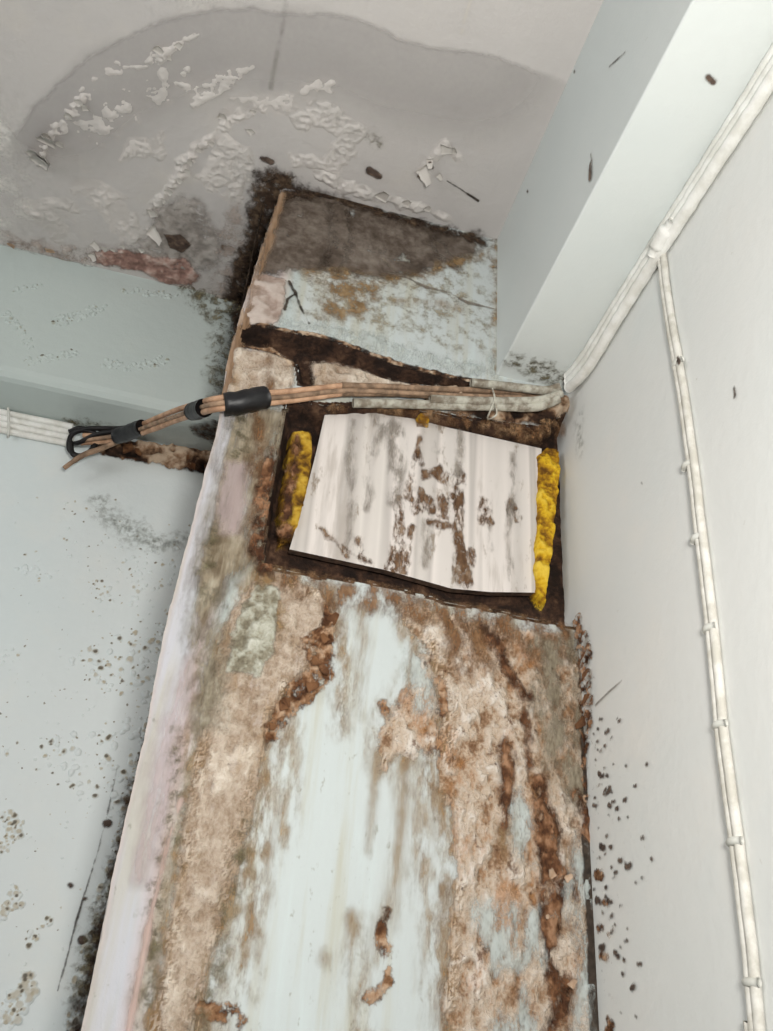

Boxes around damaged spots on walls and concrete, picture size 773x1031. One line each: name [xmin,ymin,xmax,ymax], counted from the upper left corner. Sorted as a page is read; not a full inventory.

peeling [25,33,199,170]
water stain [0,9,531,158]
water stain [164,234,191,253]
peeling [312,169,454,223]
spalling [227,347,295,392]
spalling [311,363,410,386]
spalling [247,274,496,375]
water stain [188,408,285,731]
spalling [127,395,594,1031]
water stain [532,638,628,820]
water stain [64,679,155,1031]
water stain [593,834,642,991]